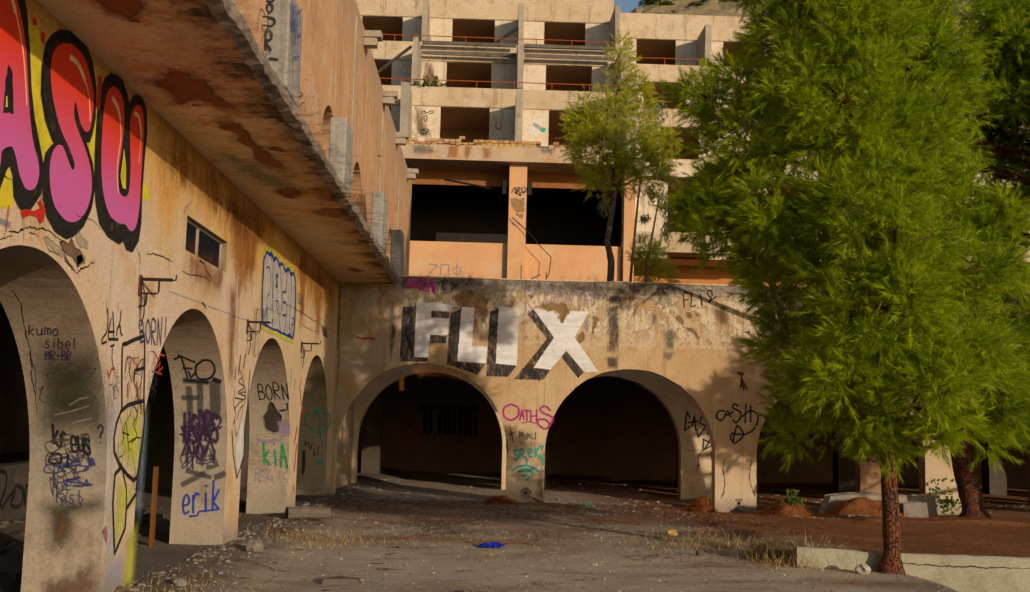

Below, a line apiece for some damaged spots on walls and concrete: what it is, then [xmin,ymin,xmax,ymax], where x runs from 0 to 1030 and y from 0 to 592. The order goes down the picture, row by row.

spalling [95,0,145,23]
spalling [151,68,288,172]
spalling [270,184,303,199]
damp [171,139,265,287]
crack [0,226,94,273]
spalling [59,238,85,268]
damp [299,252,334,331]
flaking render [528,294,570,323]
flaking render [577,316,599,344]
flaking render [674,312,700,340]
crack [903,562,1029,570]